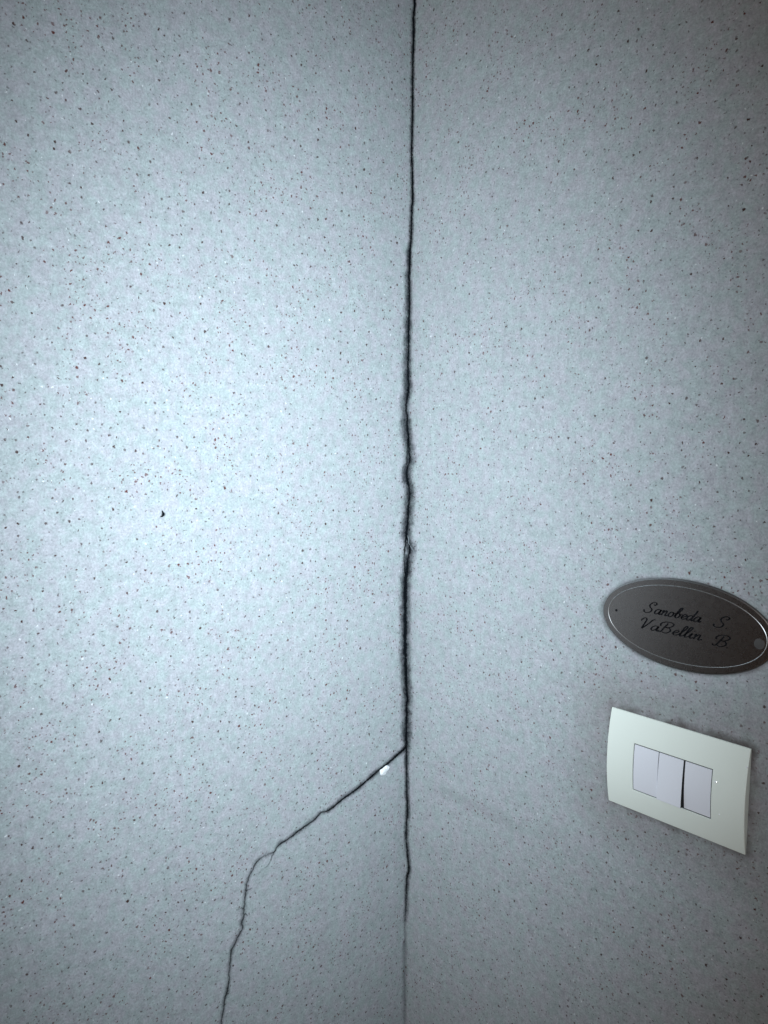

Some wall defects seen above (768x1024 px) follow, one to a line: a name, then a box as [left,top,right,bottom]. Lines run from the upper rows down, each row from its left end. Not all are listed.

crack [278,0,416,914]